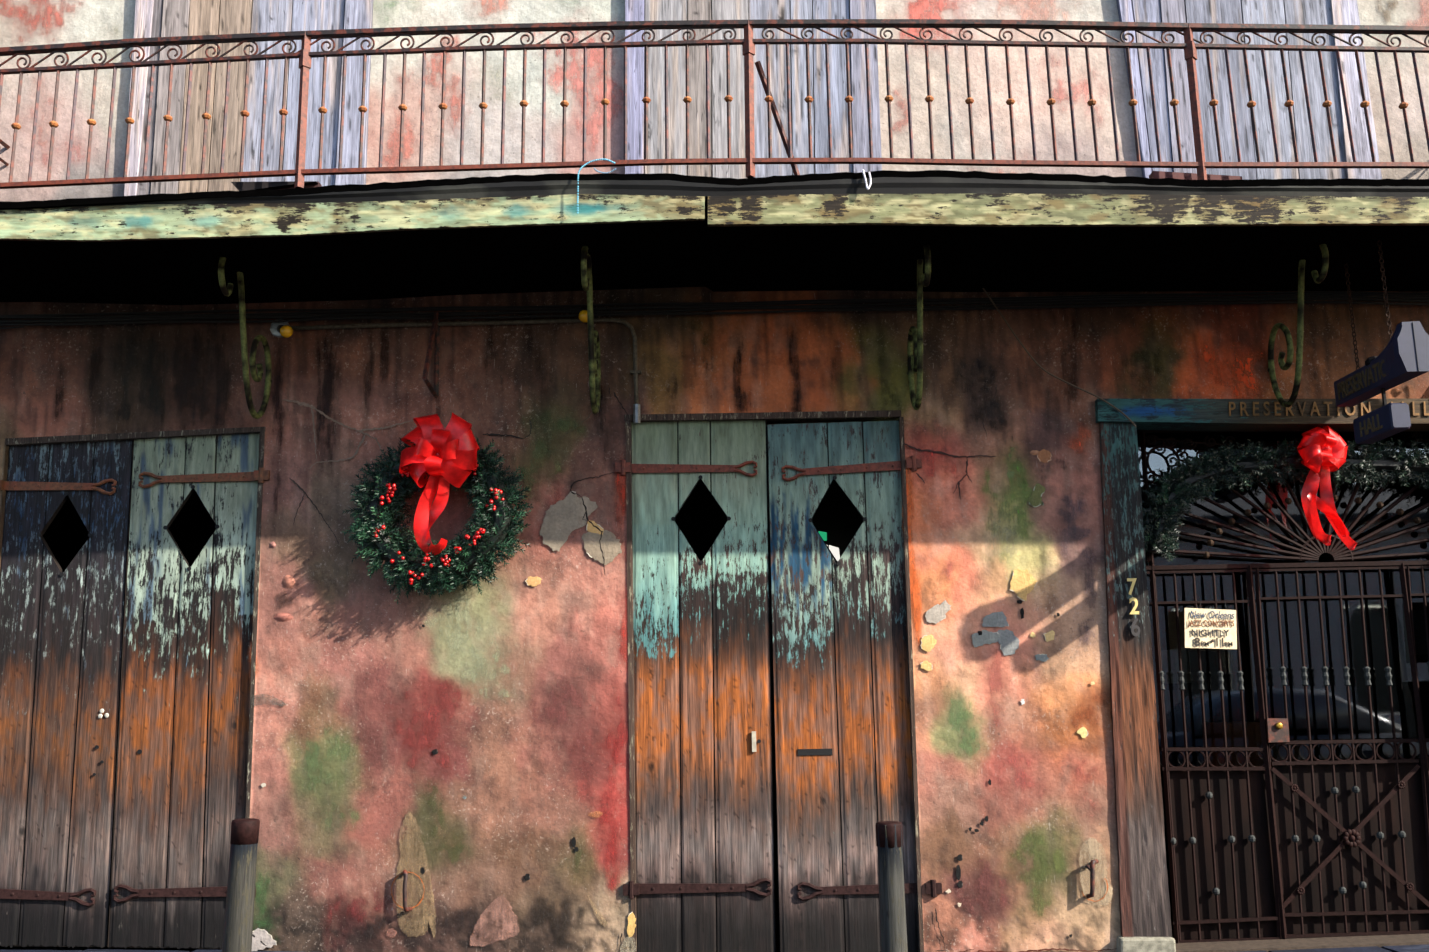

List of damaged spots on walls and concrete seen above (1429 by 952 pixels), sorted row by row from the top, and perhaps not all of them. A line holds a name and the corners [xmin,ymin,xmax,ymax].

water stain [1378,1,1398,21]
water stain [272,358,284,444]
water stain [316,339,339,460]
water stain [364,338,389,404]
water stain [733,346,746,410]
water stain [789,331,801,412]
crack [904,443,996,500]
flaking render [586,520,604,535]
flaking render [994,569,1055,655]
flaking render [920,634,937,671]